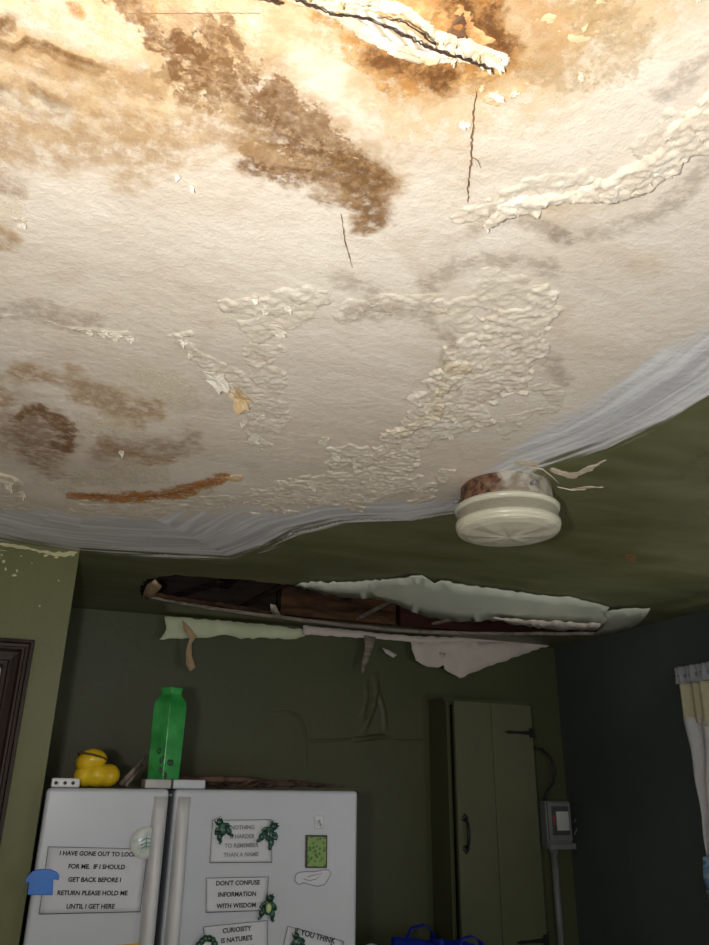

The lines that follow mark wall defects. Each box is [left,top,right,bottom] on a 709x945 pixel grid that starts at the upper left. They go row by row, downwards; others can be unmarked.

leakage [0,0,397,236]
crack [129,0,511,202]
flaking render [464,75,532,107]
leakage [371,0,674,134]
flaking render [534,8,601,47]
spalling [449,91,709,233]
flaking render [0,312,136,344]
spalling [66,266,566,519]
peeling [514,460,606,491]
spalling [143,580,162,600]